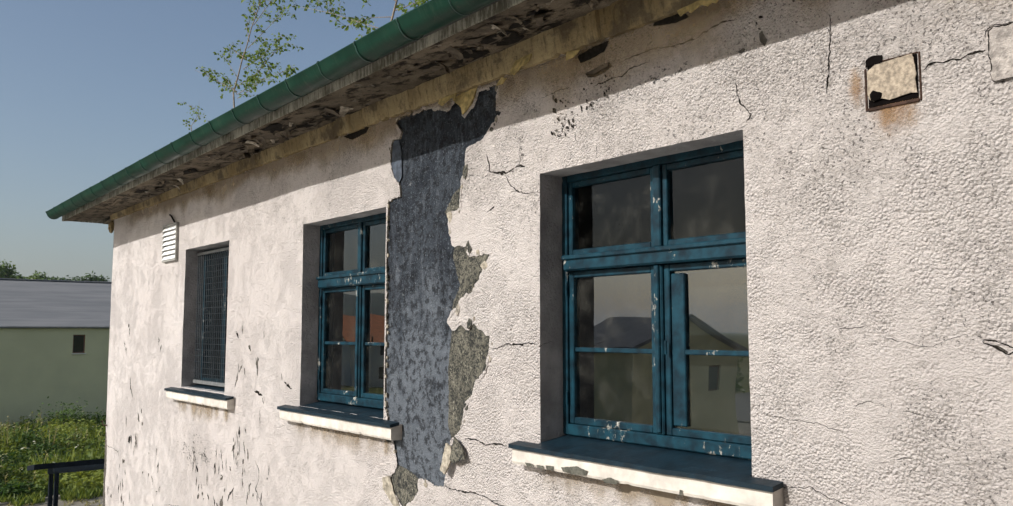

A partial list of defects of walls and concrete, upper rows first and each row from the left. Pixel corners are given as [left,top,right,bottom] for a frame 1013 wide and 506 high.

peeling [386,0,557,80]
spalling [551,41,615,138]
peeling [653,0,718,26]
crack [823,18,831,94]
crack [924,22,1013,82]
peeling [102,106,353,211]
crack [468,154,534,212]
peeling [382,77,507,506]
crack [492,341,552,354]
peeling [183,426,262,506]
crack [443,486,504,506]
crack [465,438,508,449]